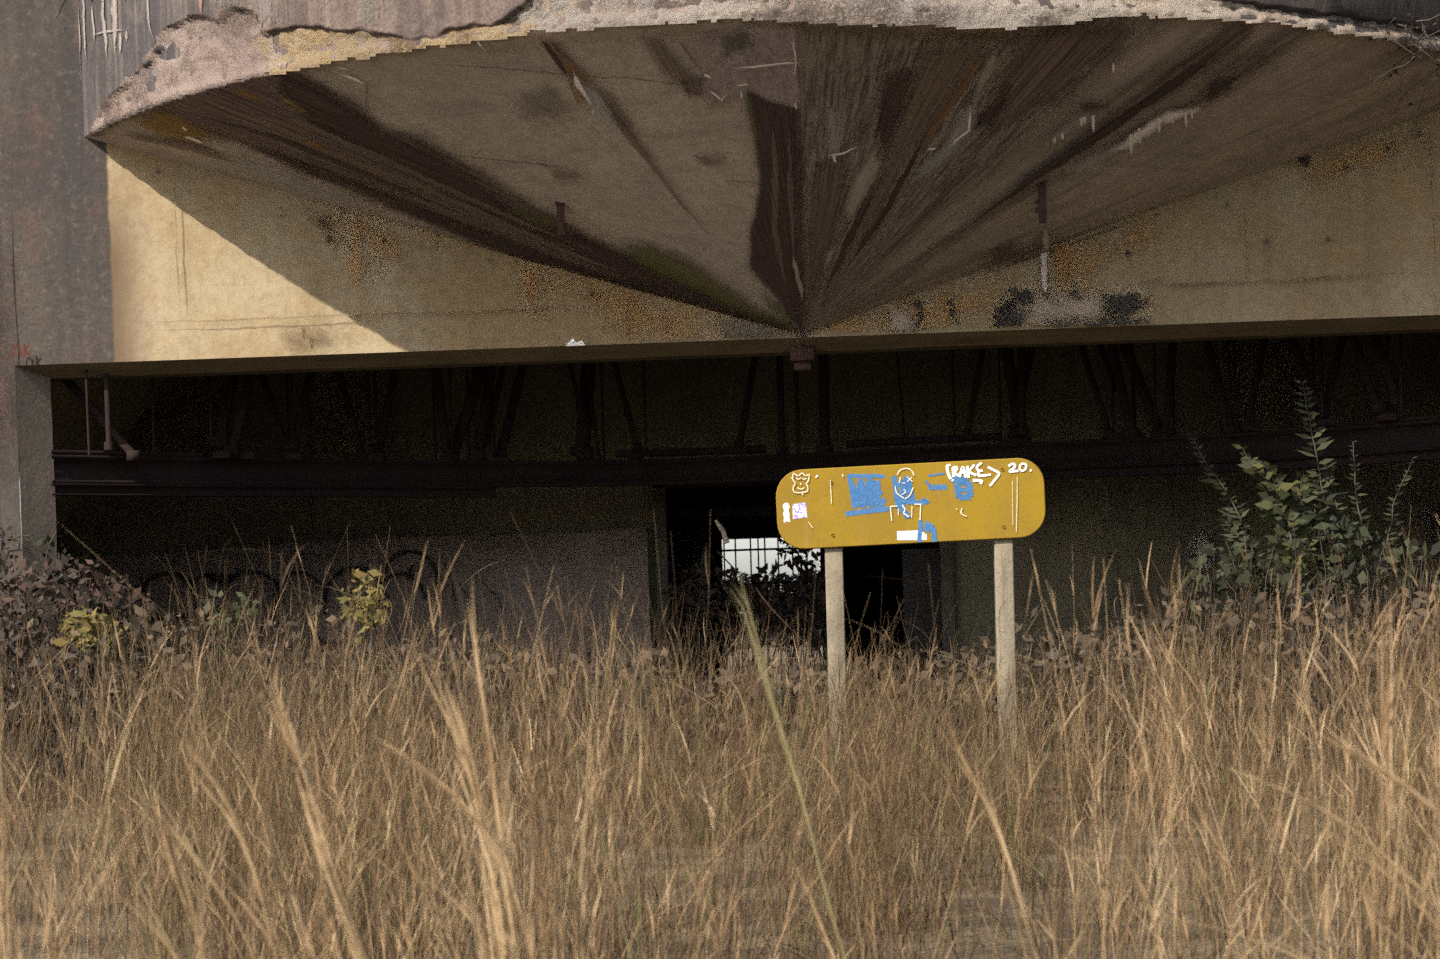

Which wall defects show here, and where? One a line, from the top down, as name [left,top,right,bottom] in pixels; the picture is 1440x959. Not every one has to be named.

spalling [90,0,1440,137]